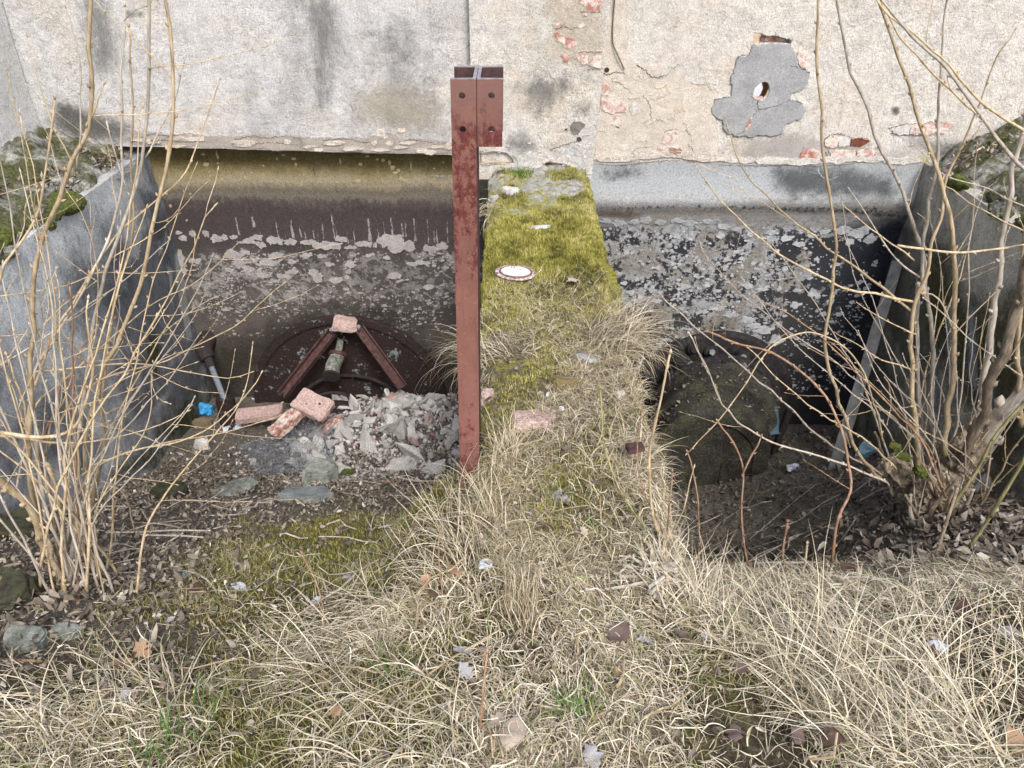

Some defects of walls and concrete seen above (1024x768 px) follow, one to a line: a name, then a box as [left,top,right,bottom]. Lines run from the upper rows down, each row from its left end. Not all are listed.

flaking render [548,0,923,166]
flaking render [888,121,953,136]
peeling [176,219,456,336]
water stain [251,215,449,244]
peeling [600,216,878,390]